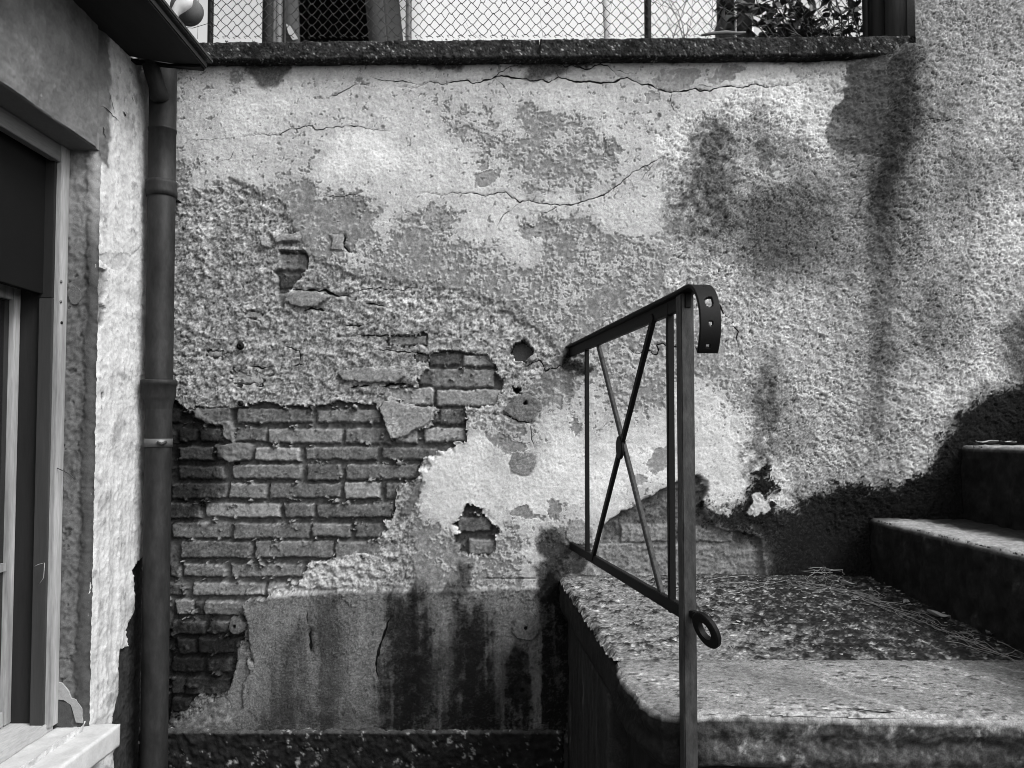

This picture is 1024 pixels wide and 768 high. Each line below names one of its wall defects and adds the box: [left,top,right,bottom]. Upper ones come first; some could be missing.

crack [325,39,807,110]
crack [431,142,678,224]
flaking render [274,249,309,307]
flaking render [168,331,528,722]
damp [374,527,591,733]